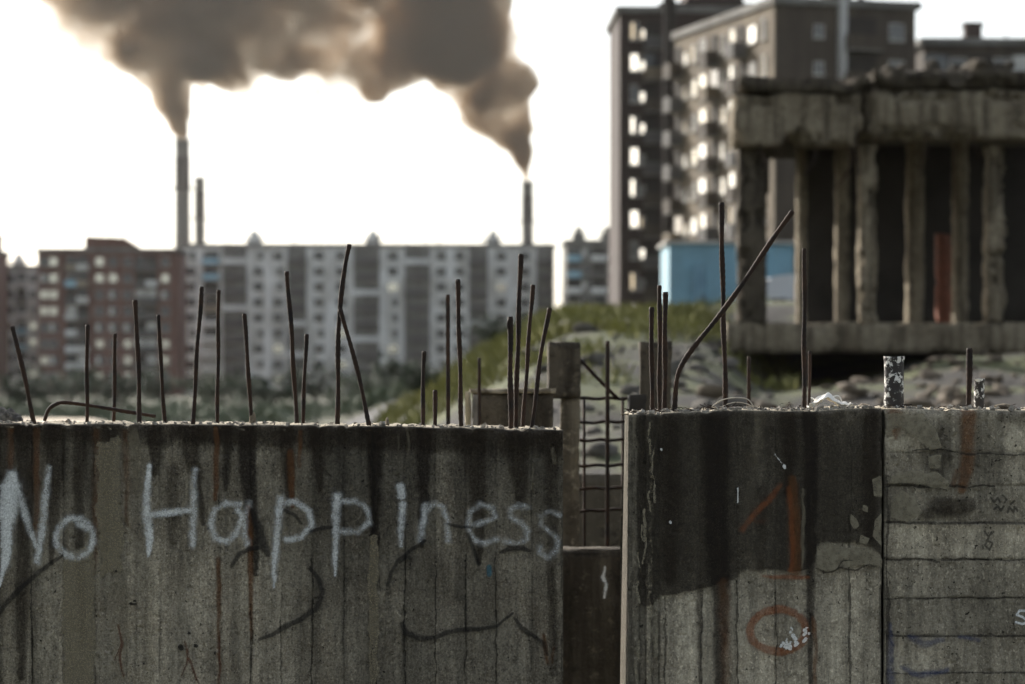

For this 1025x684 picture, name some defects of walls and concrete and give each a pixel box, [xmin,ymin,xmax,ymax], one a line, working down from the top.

leakage [0,424,562,680]
leakage [635,409,882,684]
spalling [816,413,950,571]